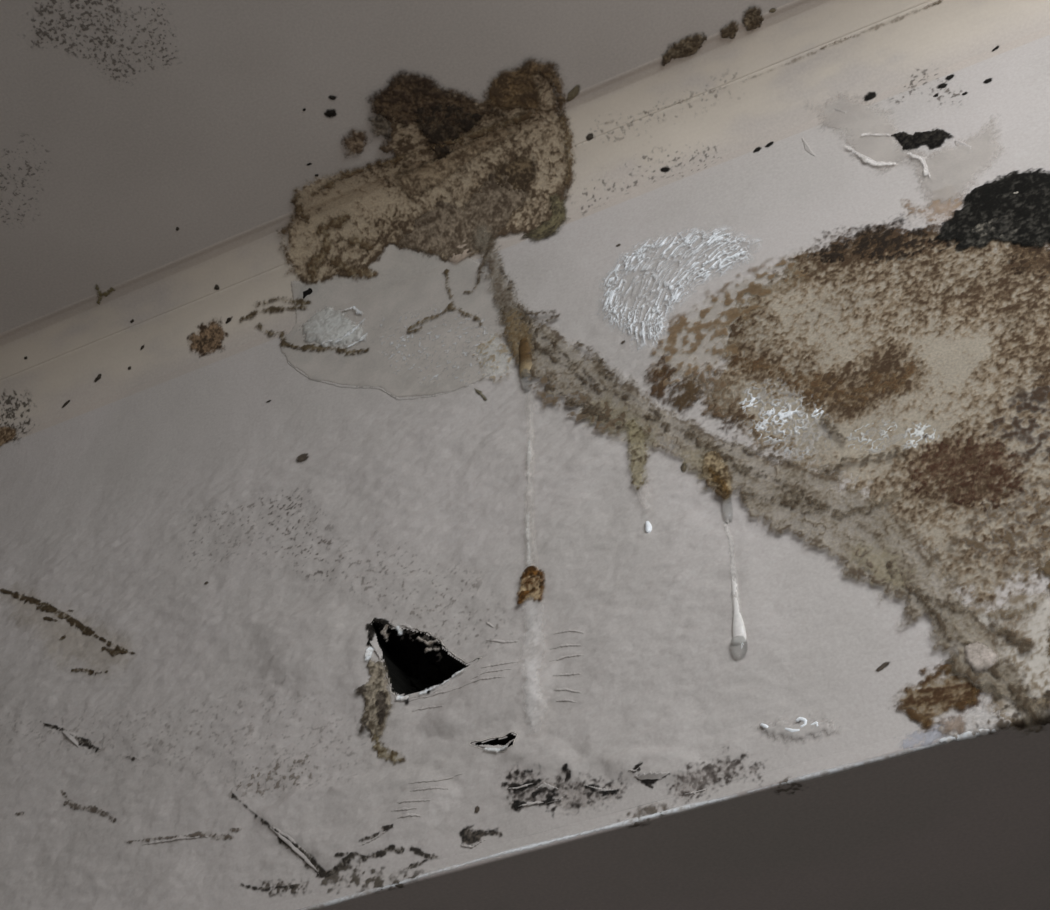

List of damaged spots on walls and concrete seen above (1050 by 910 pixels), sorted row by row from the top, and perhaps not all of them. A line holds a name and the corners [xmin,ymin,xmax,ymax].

peeling [824,95,1002,202]
spalling [0,391,30,441]
water stain [187,59,1050,733]
rust [517,566,545,604]
crack [0,589,134,675]
peeling [502,763,623,811]
peeling [628,754,761,798]
crack [61,791,437,891]
peeling [627,805,667,827]